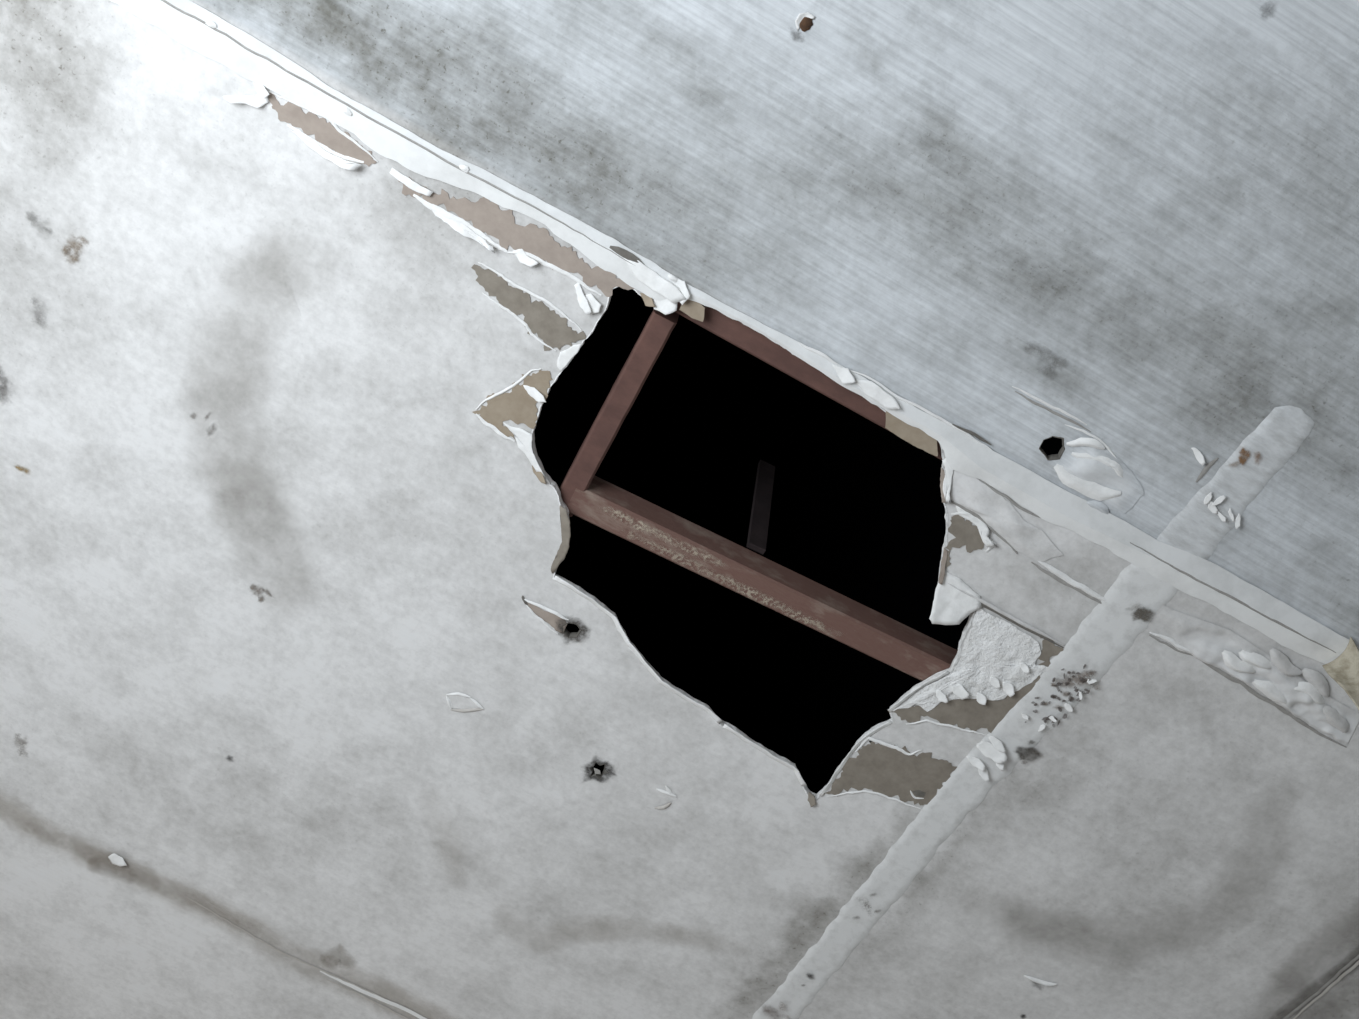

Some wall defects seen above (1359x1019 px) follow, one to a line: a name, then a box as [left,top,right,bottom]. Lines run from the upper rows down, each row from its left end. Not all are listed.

peeling [222,82,690,351]
peeling [473,368,553,442]
peeling [832,364,902,410]
peeling [945,506,997,568]
spalling [527,602,567,633]
spalling [824,608,1097,810]